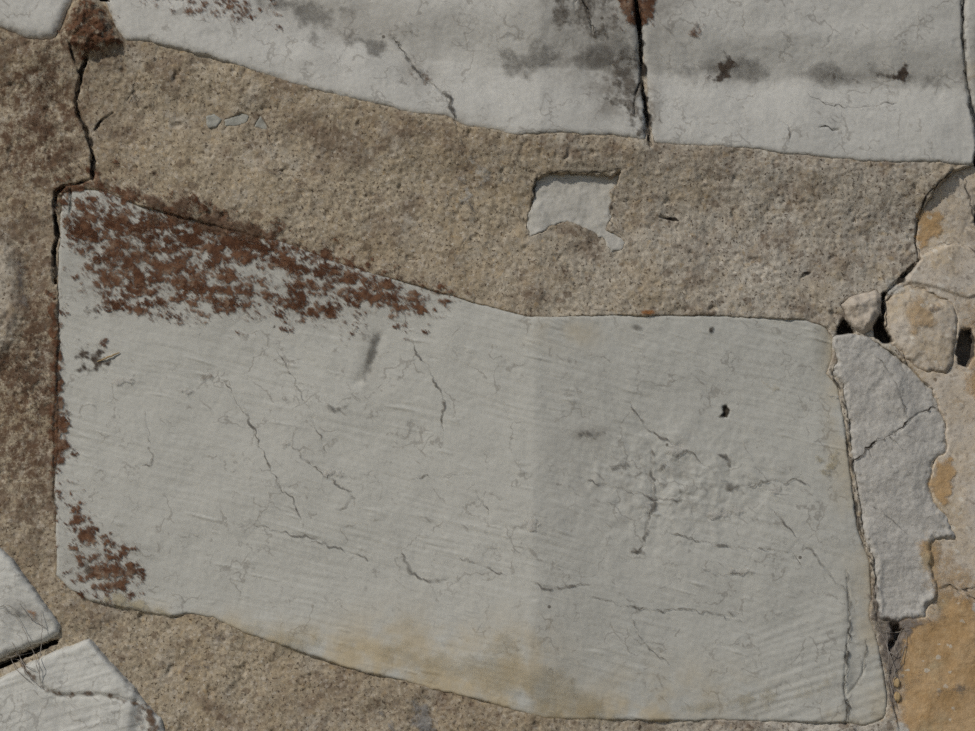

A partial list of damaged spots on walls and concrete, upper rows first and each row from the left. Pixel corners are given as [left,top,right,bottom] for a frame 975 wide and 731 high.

corrosion [618,0,656,31]
crack [633,0,651,145]
crack [961,5,974,121]
crack [51,44,108,283]
corrosion [19,69,455,340]
flaking render [527,173,625,253]
peeling [916,210,944,248]
corrosion [0,289,146,607]
peeling [928,457,956,506]
peeling [896,541,975,731]